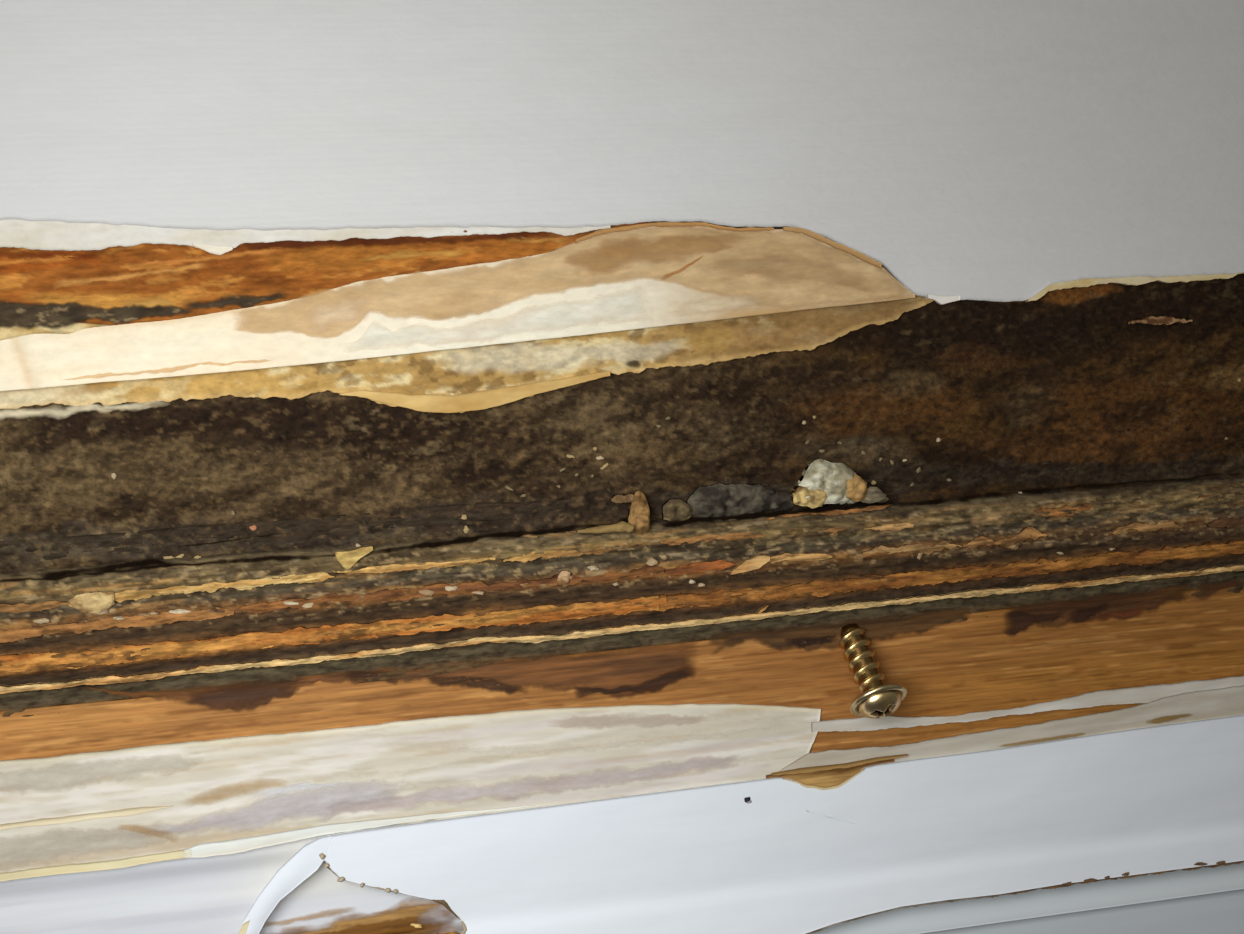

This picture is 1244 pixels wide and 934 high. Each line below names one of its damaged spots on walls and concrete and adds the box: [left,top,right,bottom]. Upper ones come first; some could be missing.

rust [0,222,651,325]
water stain [0,294,281,329]
flaking render [0,222,1244,573]
water stain [713,609,968,651]
water stain [1006,586,1186,635]
water stain [91,645,693,711]
peeling [0,675,1244,934]
water stain [279,903,449,934]